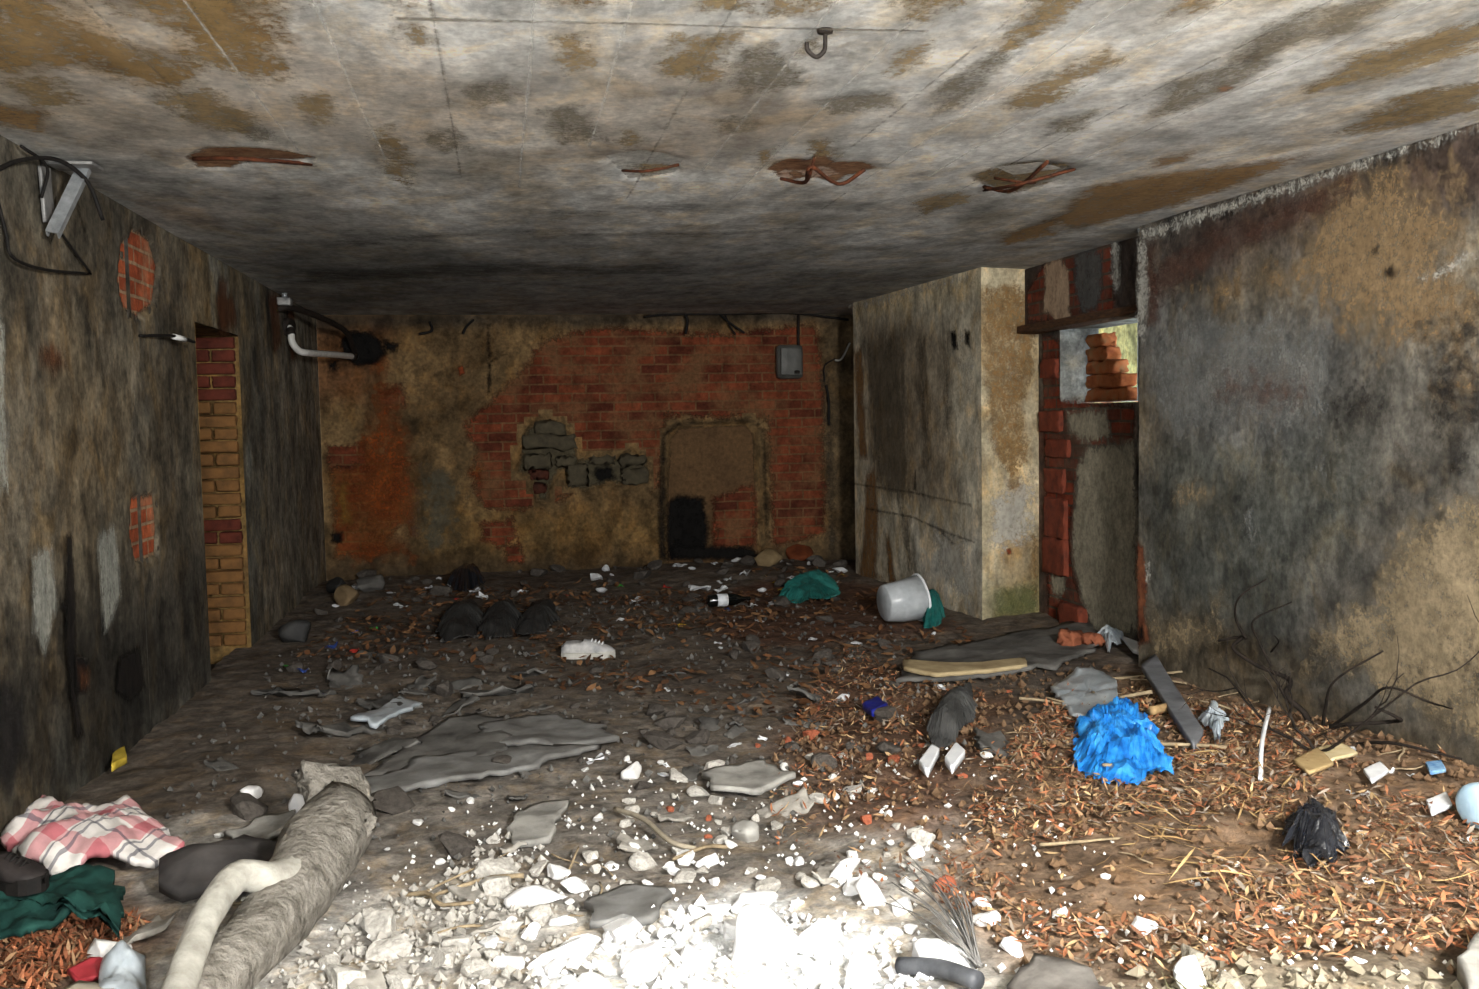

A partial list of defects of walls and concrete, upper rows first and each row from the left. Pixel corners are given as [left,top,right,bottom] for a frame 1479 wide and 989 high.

peeling [0,0,313,168]
peeling [1153,0,1383,116]
peeling [1302,21,1479,94]
spalling [758,140,874,186]
spalling [911,160,1076,216]
water stain [0,324,8,485]
peeling [1027,82,1479,659]
water stain [1152,311,1382,436]
water stain [1431,322,1479,468]
efflorescence [33,551,56,650]
water stain [98,527,120,629]
water stain [0,677,25,791]